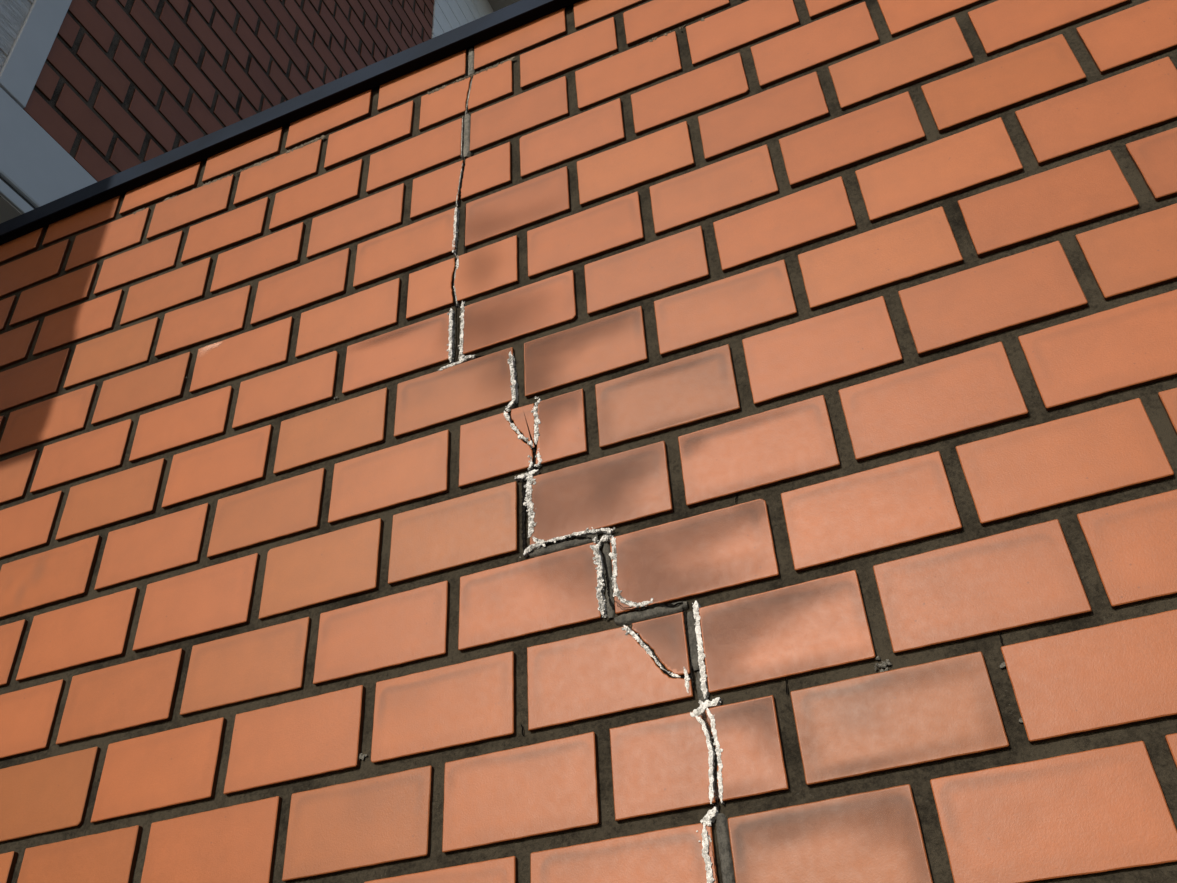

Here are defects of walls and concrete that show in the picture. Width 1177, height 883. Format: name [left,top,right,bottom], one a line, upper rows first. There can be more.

crack [452,152,486,363]
crack [506,397,719,808]